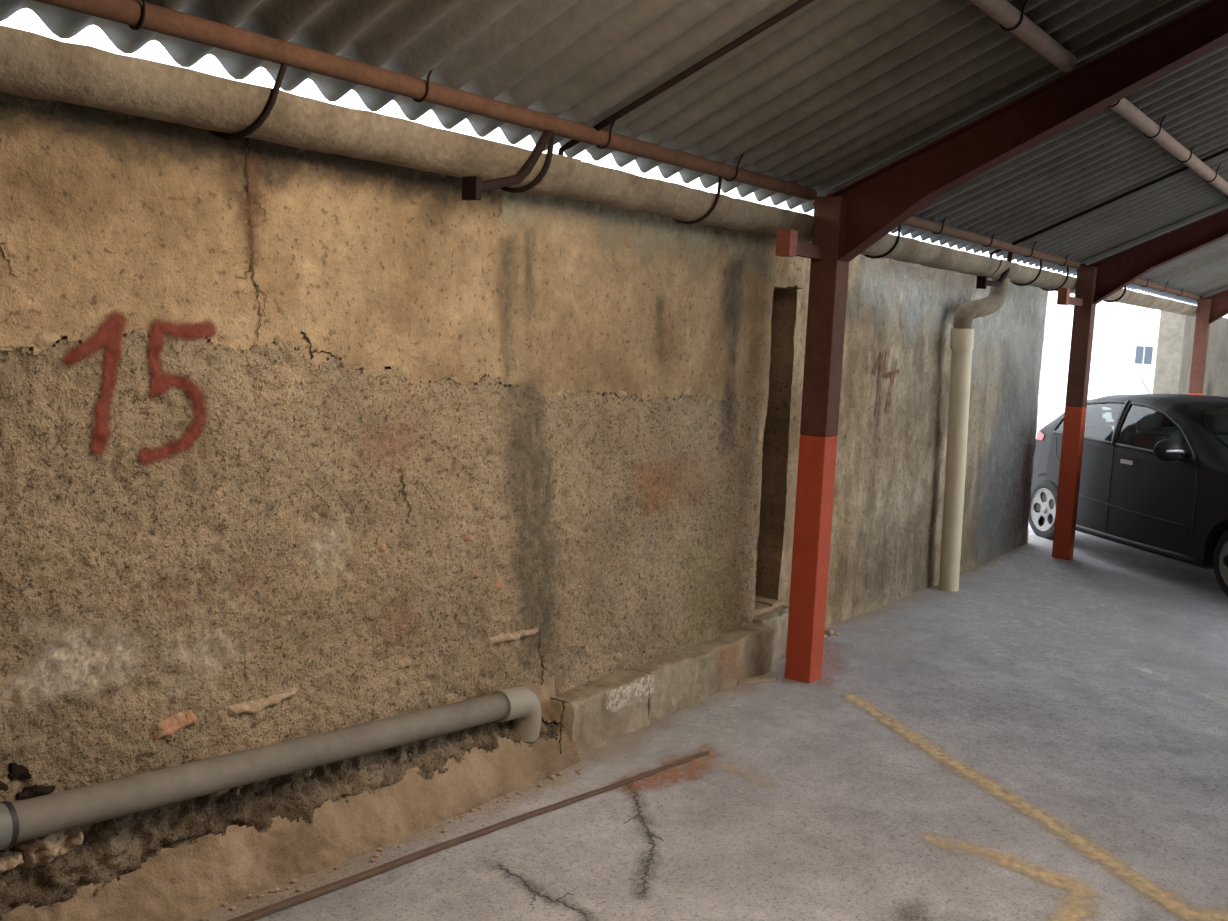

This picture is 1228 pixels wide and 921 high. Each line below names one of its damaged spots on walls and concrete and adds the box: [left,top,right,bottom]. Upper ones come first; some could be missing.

flaking render [0,328,764,920]
crack [498,864,588,921]
crack [624,784,663,897]